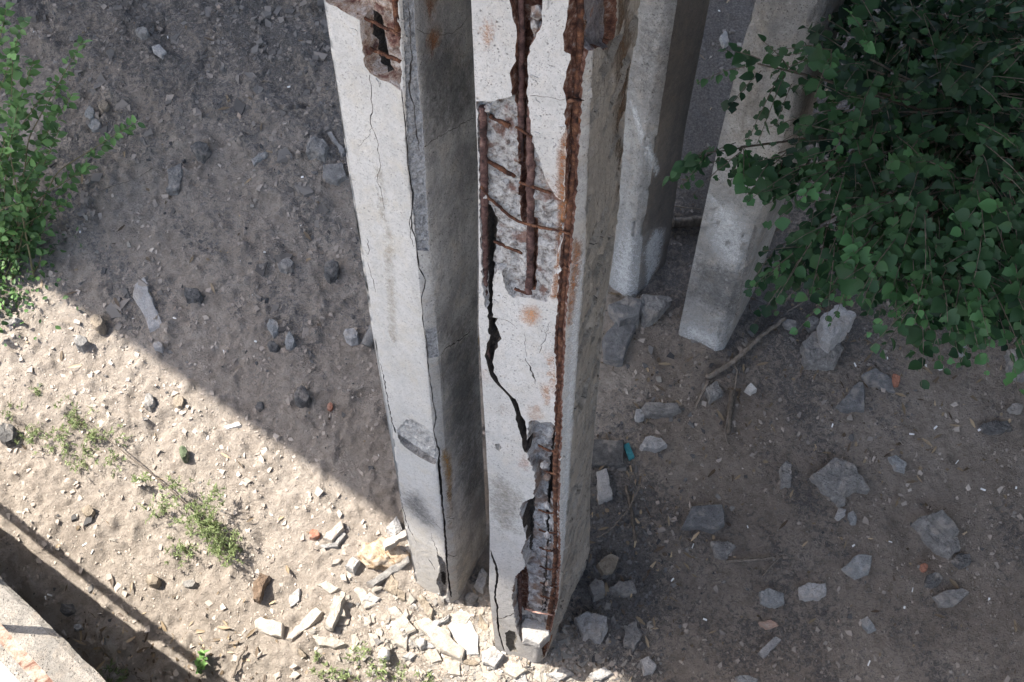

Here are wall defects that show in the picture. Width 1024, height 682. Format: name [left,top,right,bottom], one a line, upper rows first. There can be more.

spalling [325,0,429,251]
crack [362,2,549,597]
spalling [476,0,618,658]
rust [551,132,580,323]
crack [491,552,514,651]